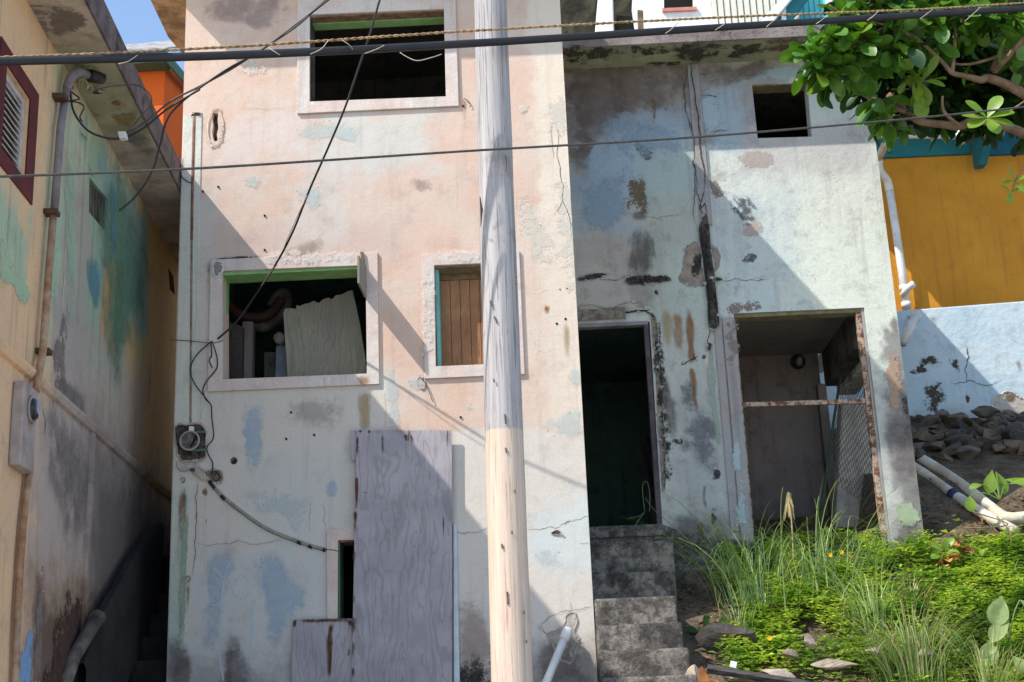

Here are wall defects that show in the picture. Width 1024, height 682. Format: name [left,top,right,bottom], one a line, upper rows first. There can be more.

peeling [555,180,667,491]
corrosion [665,314,696,403]
spalling [624,212,762,365]
crack [635,66,768,365]
peeling [884,353,960,415]